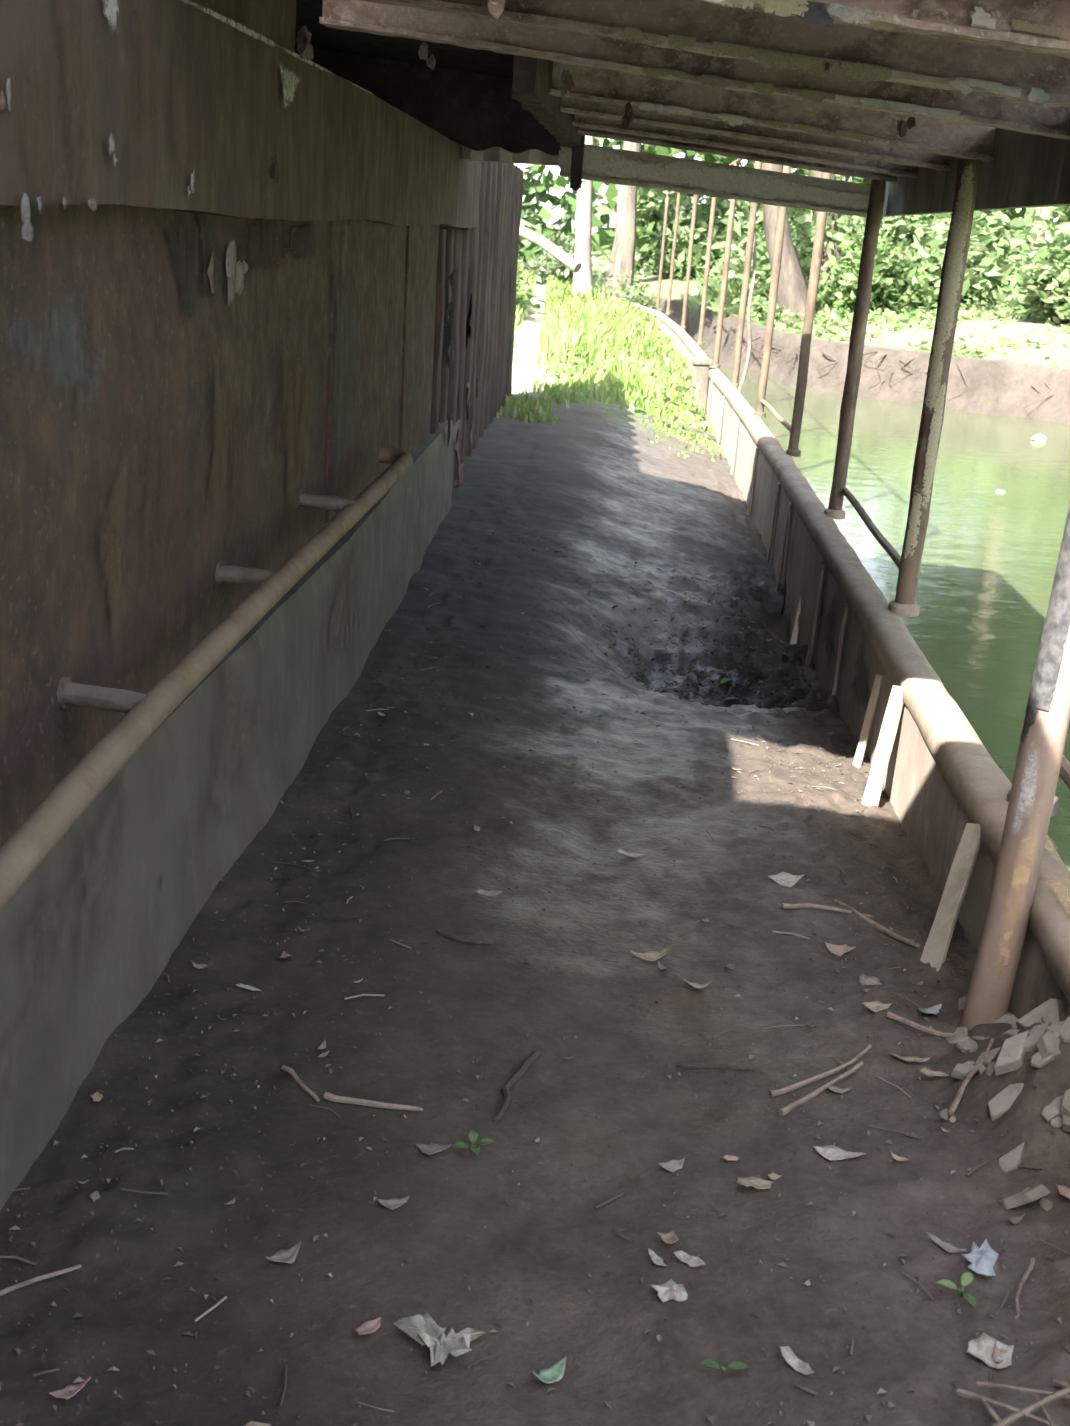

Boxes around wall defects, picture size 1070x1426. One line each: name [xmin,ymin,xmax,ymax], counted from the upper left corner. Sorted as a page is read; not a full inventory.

peeling [970,6,1062,39]
corrosion [295,25,314,61]
corrosion [418,42,436,70]
peeling [0,78,11,112]
peeling [109,133,117,168]
peeling [21,193,42,242]
peeling [88,198,97,212]
peeling [207,240,249,306]
corrosion [1014,755,1038,827]
corrosion [1011,835,1055,891]